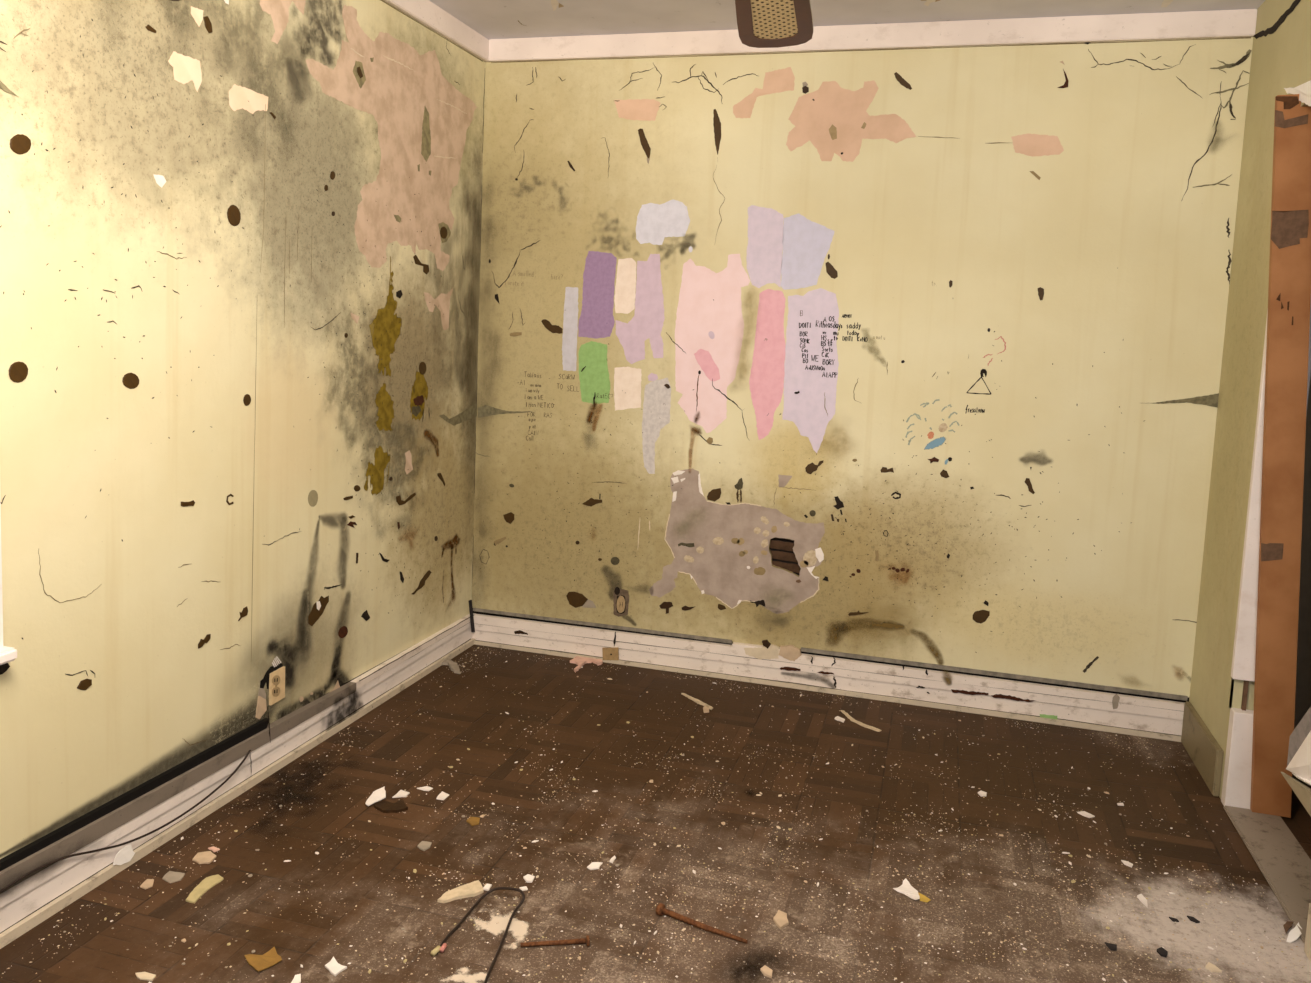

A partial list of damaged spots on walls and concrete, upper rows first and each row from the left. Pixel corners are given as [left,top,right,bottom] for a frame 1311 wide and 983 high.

peeling [259,0,306,44]
damp [288,0,342,93]
peeling [305,5,477,271]
crack [615,64,757,110]
peeling [733,67,916,162]
peeling [1011,134,1064,157]
crack [1084,42,1222,199]
peeling [424,288,453,330]
damp [319,244,430,499]
flaking render [649,468,825,614]
damp [828,619,951,685]